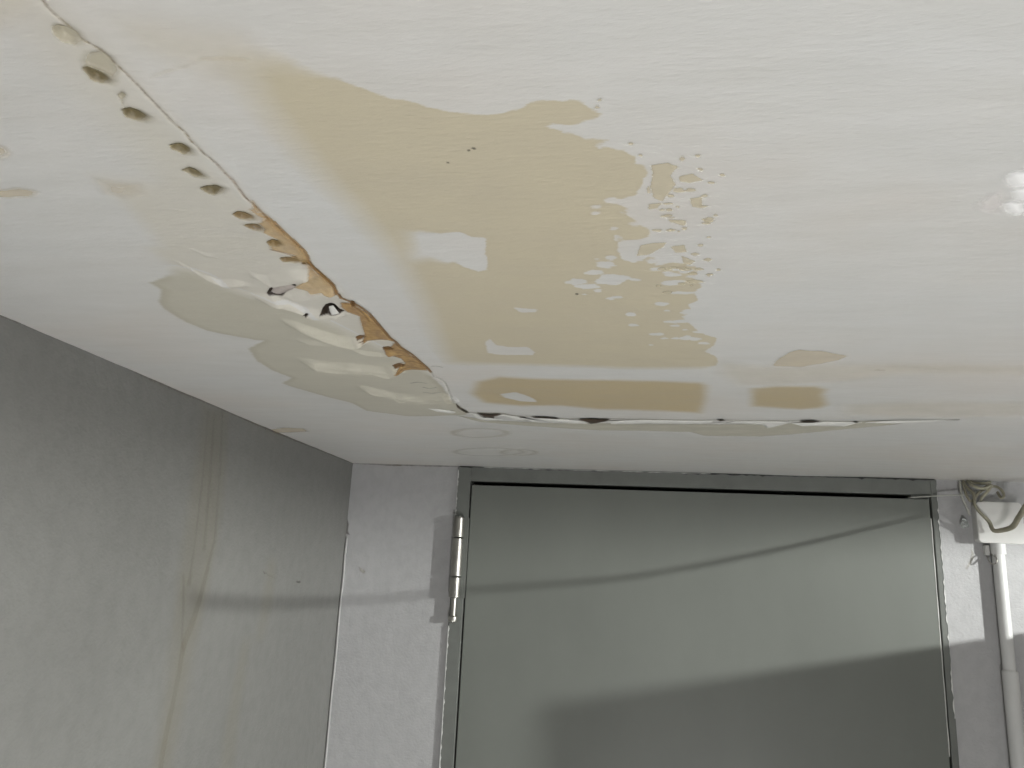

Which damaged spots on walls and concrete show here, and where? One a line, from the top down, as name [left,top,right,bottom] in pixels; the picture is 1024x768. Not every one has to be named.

hole [233,211,262,230]
damp [0,0,890,436]
hole [267,239,299,262]
hole [303,303,344,317]
crack [306,255,432,372]
crack [456,404,610,424]